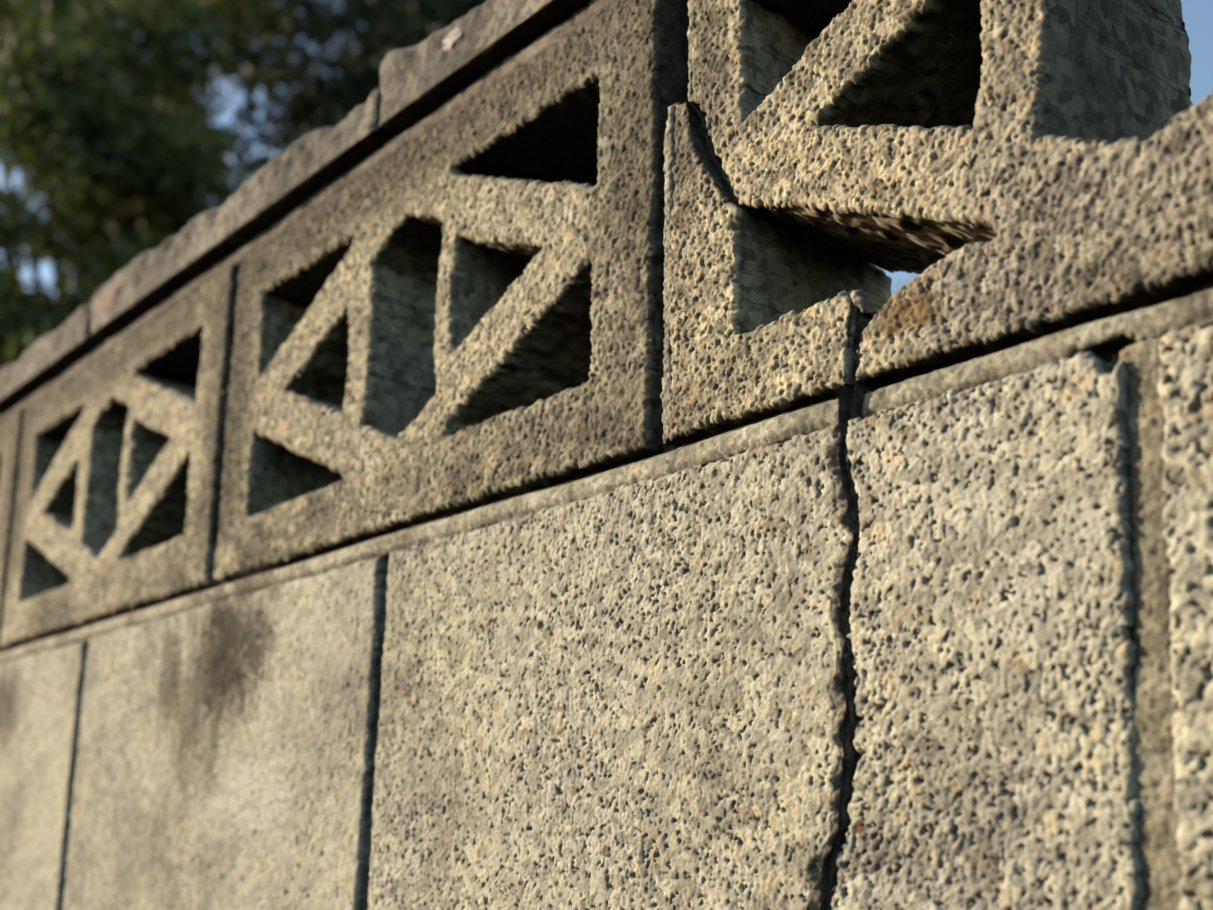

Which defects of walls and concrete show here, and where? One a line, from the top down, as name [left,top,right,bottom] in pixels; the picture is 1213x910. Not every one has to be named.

crack [686,100,797,232]
leakage [208,608,266,704]
crack [806,302,872,910]